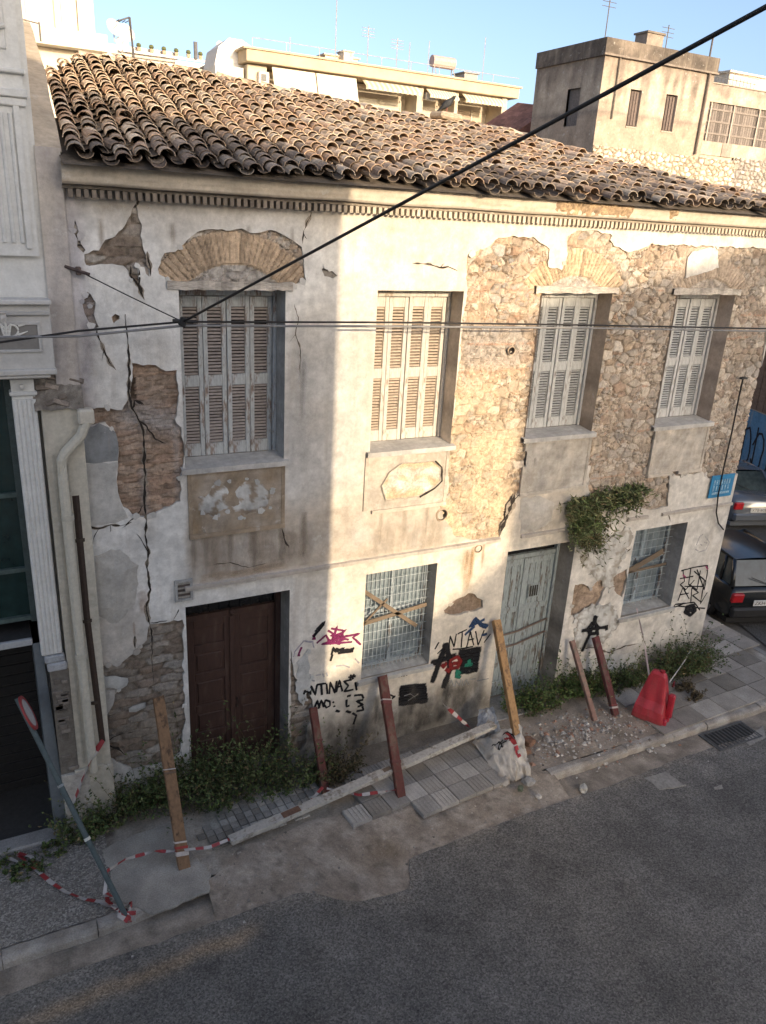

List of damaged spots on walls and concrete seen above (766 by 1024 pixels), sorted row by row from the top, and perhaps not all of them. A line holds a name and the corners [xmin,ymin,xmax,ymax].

spalling [68,205,306,290]
crack [91,251,179,691]
spalling [92,363,184,520]
peeling [198,478,276,520]
spalling [381,230,766,553]
spalling [444,593,481,614]
peeling [570,526,634,651]
spalling [103,620,187,768]